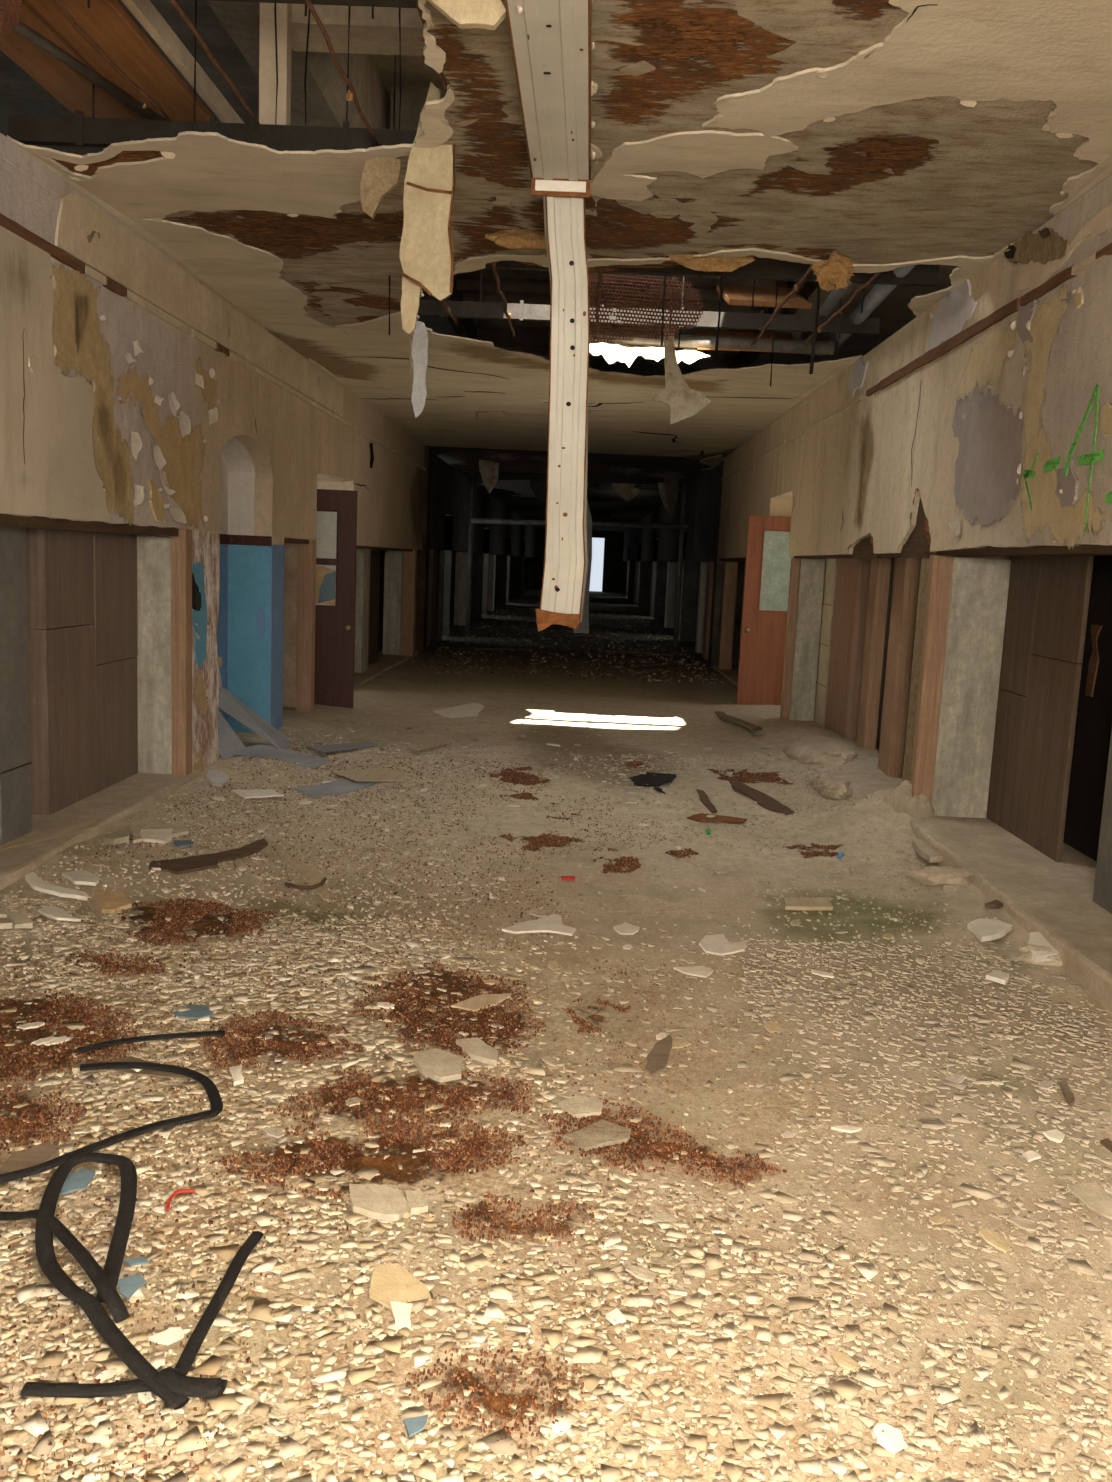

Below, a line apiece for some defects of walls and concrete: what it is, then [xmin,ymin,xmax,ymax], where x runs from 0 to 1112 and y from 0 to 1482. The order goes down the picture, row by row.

flaking render [152,156,409,328]
flaking render [423,0,547,274]
flaking render [585,0,1112,559]